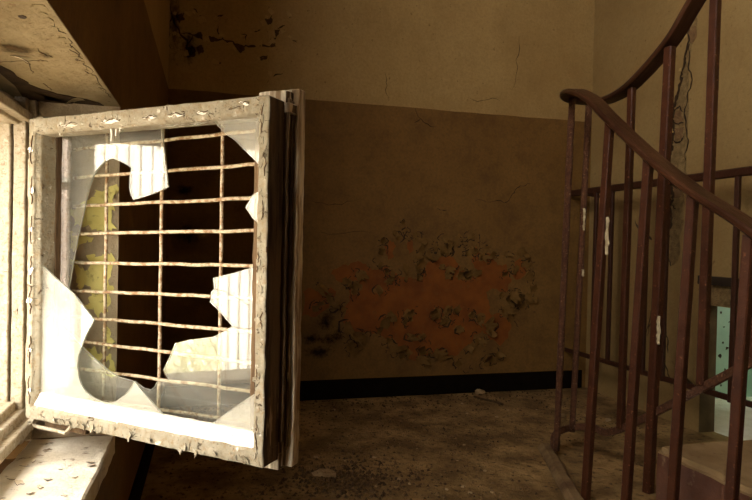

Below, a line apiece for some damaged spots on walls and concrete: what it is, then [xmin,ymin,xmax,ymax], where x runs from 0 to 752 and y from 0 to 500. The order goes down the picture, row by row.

crack [54,23,110,97]
flaking render [671,18,698,175]
flaking render [669,185,685,266]